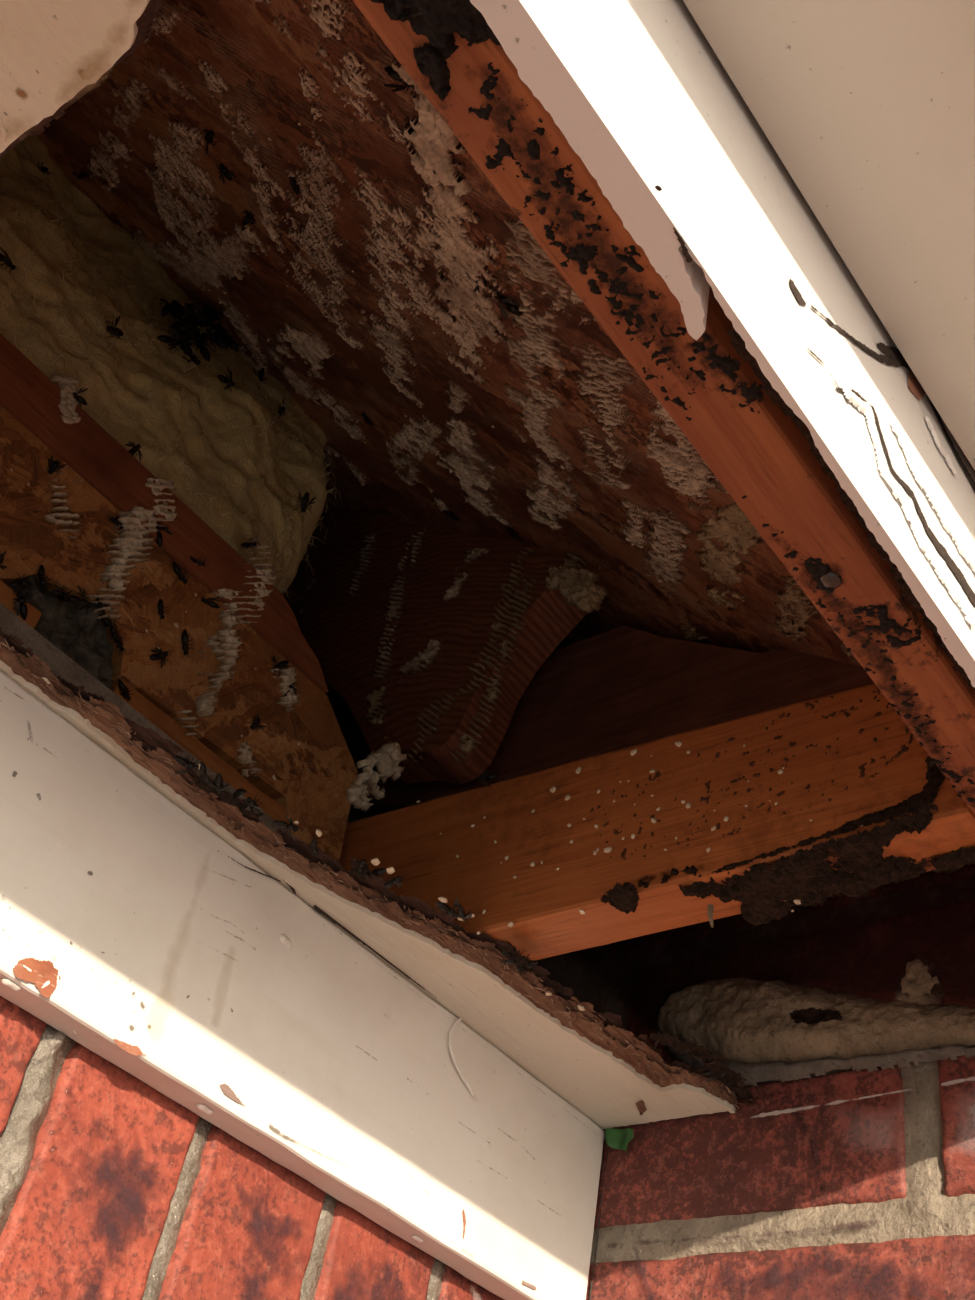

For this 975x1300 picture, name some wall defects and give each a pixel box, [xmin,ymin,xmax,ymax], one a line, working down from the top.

water stain [371,0,504,101]
water stain [468,62,764,421]
water stain [783,551,975,805]
peeling [13,958,59,998]
peeling [220,1084,245,1106]